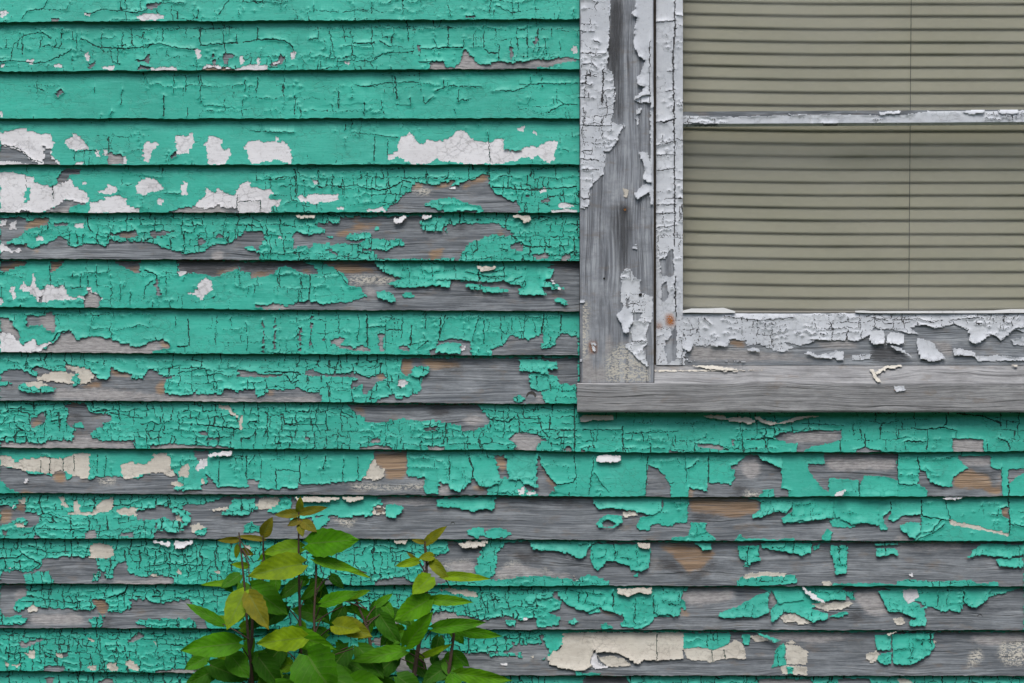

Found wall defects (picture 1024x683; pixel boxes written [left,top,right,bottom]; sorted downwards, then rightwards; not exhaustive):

peeling [0,0,1024,431]
crack [0,0,1024,503]
crack [0,476,280,683]
crack [234,539,617,658]
peeling [0,364,1024,683]
crack [504,675,564,683]
crack [588,540,647,568]
crack [629,630,851,683]
crack [761,482,860,523]
crack [738,500,956,590]
crack [876,580,1024,683]